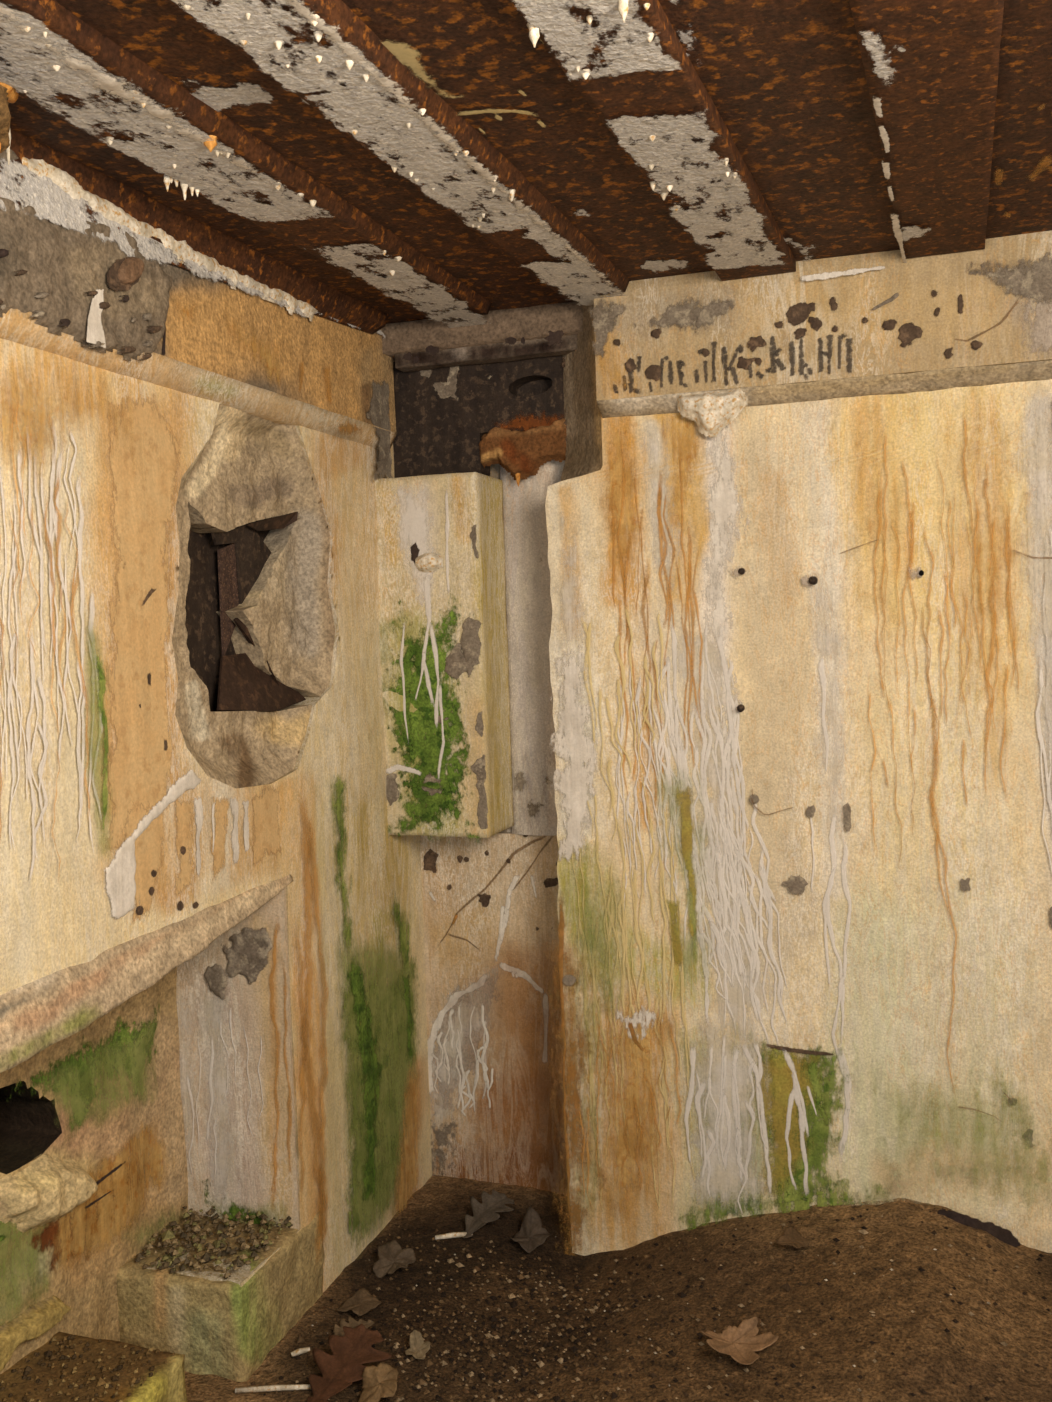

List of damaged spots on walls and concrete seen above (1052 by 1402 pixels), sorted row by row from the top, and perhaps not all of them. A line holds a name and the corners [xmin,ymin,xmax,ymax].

spalling [105,394,335,920]
damp [386,764,421,775]
damp [398,488,450,778]
damp [427,875,551,1178]
crack [440,838,551,949]
corrosion [606,419,703,795]
damp [551,426,817,1213]